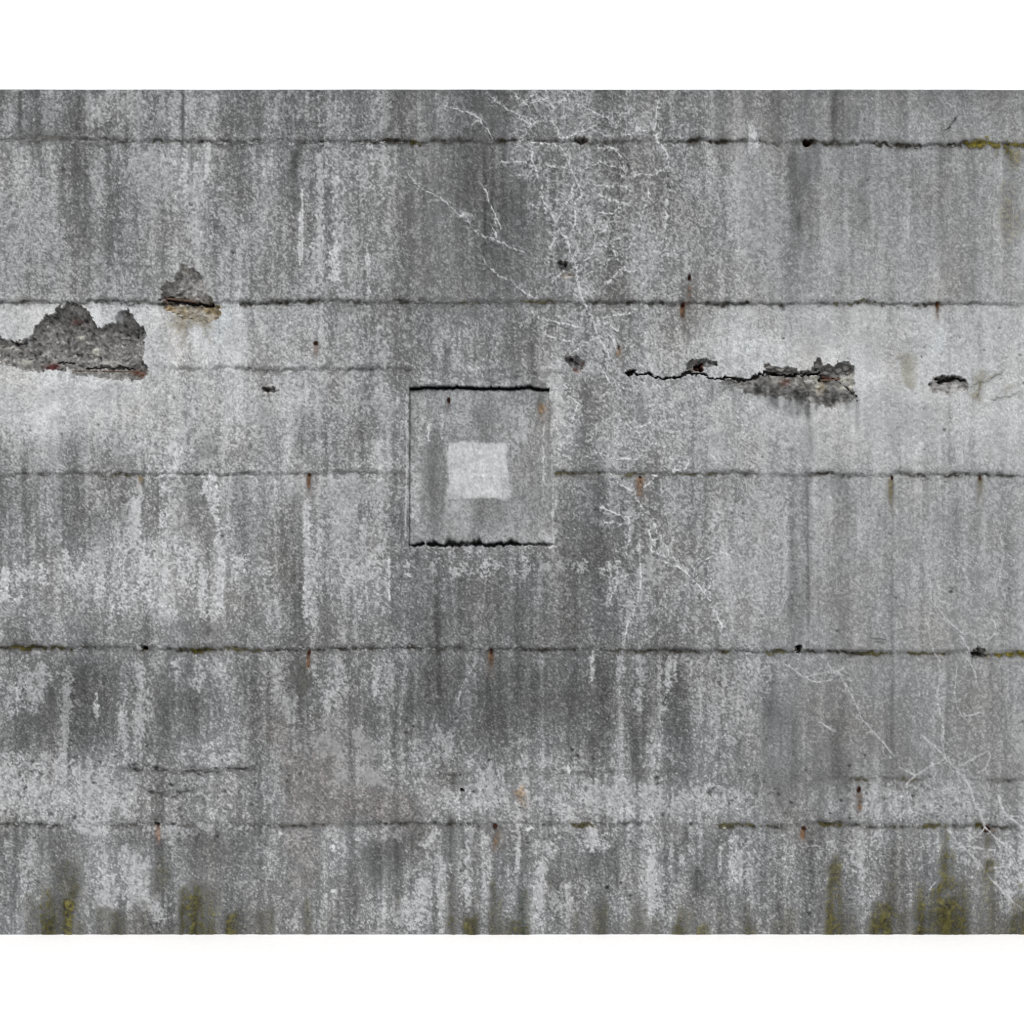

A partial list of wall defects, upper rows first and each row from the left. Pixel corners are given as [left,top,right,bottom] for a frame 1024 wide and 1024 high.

water stain [127,141,212,253]
water stain [298,93,342,297]
spalling [0,262,222,383]
crack [408,89,724,638]
spalling [625,356,858,410]
spalling [928,374,970,396]
water stain [0,379,248,624]
water stain [289,475,391,618]
water stain [708,482,795,622]
water stain [118,661,149,756]
water stain [0,752,136,836]
water stain [443,785,498,900]